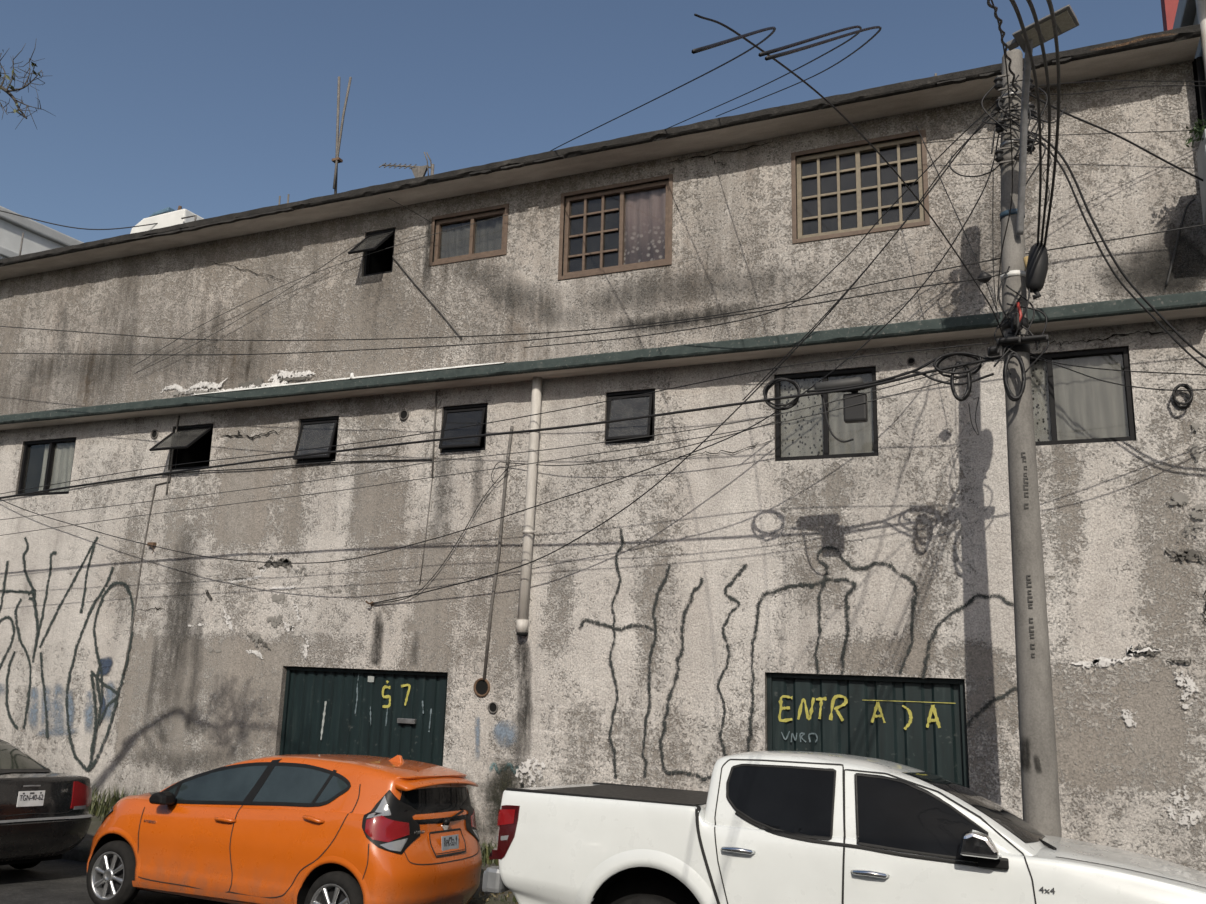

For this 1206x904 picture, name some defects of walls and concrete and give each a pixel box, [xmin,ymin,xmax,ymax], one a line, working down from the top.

damp [1115,230,1206,290]
damp [627,306,739,328]
peeling [160,369,316,396]
peeling [204,589,233,630]
peeling [229,555,314,659]
damp [518,643,530,735]
peeling [1119,709,1140,729]
peeling [1071,644,1200,709]
damp [488,751,519,830]
peeling [1161,783,1203,839]